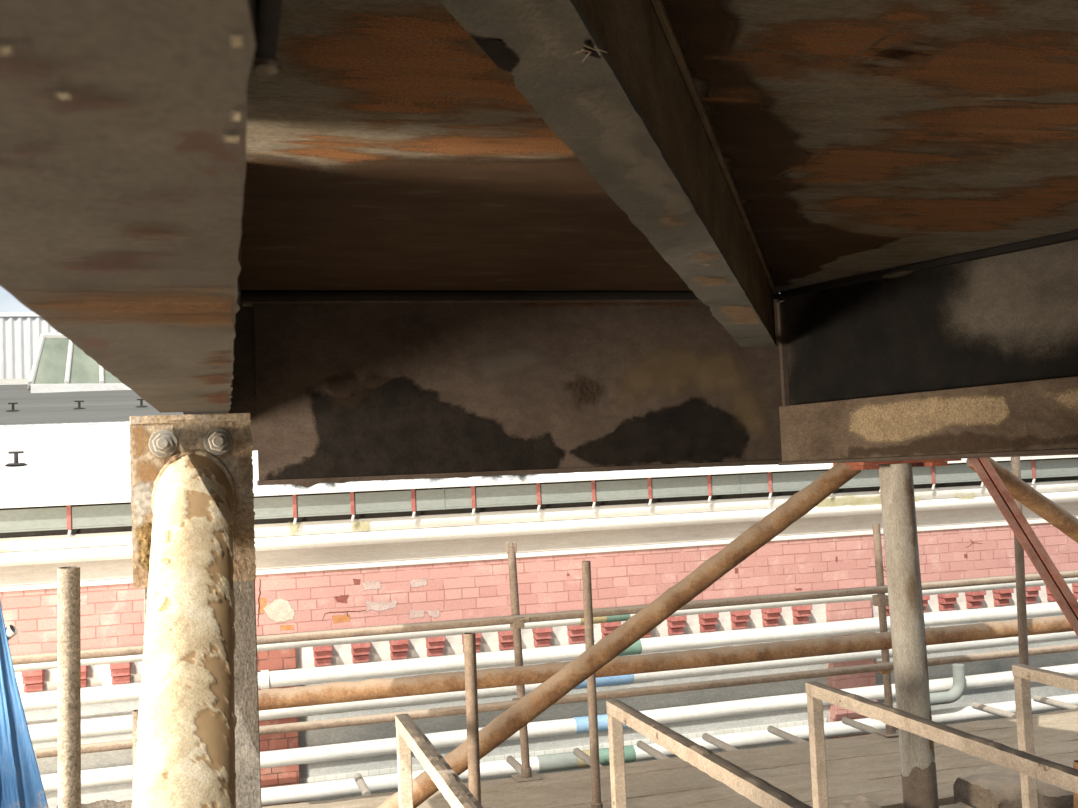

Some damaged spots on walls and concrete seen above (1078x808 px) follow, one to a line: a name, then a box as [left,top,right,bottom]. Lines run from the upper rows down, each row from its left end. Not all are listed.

rust [274,120,576,163]
water stain [662,0,898,286]
rust [134,426,156,483]
rust [134,522,153,571]